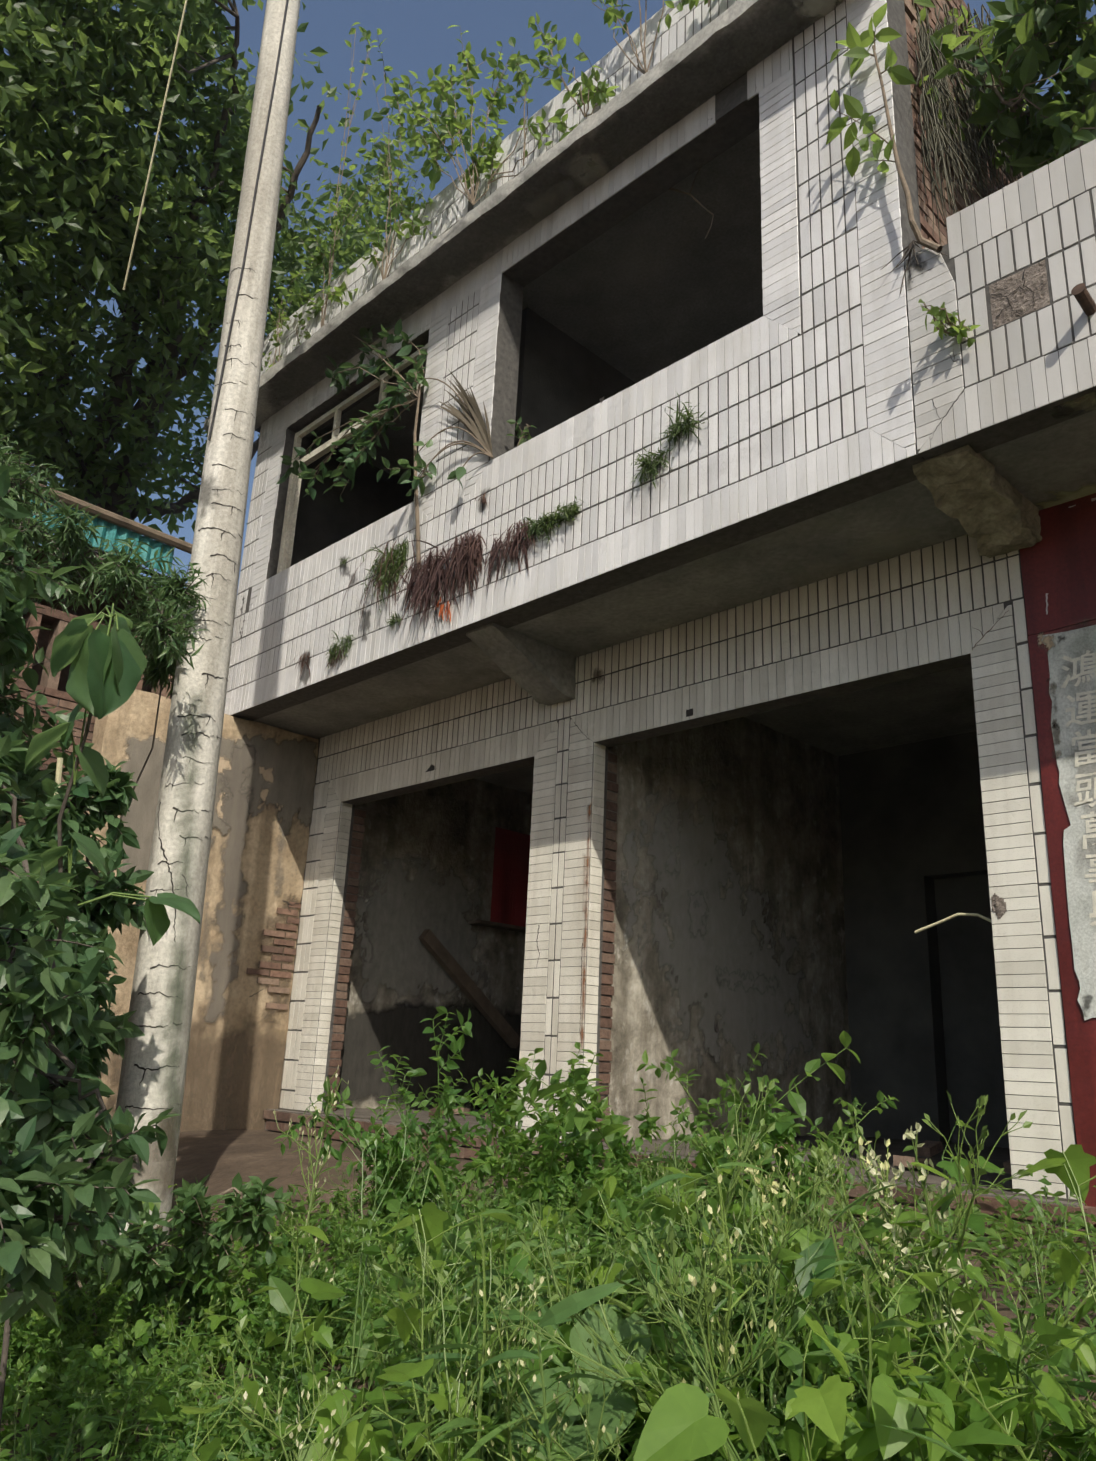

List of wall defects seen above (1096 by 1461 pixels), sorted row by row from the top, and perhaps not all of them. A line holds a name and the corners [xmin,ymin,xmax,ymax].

crack [136,267,258,1028]
flaking render [119,735,166,873]
flaking render [210,735,317,849]
flaking render [246,895,301,1019]
crack [125,1064,181,1110]